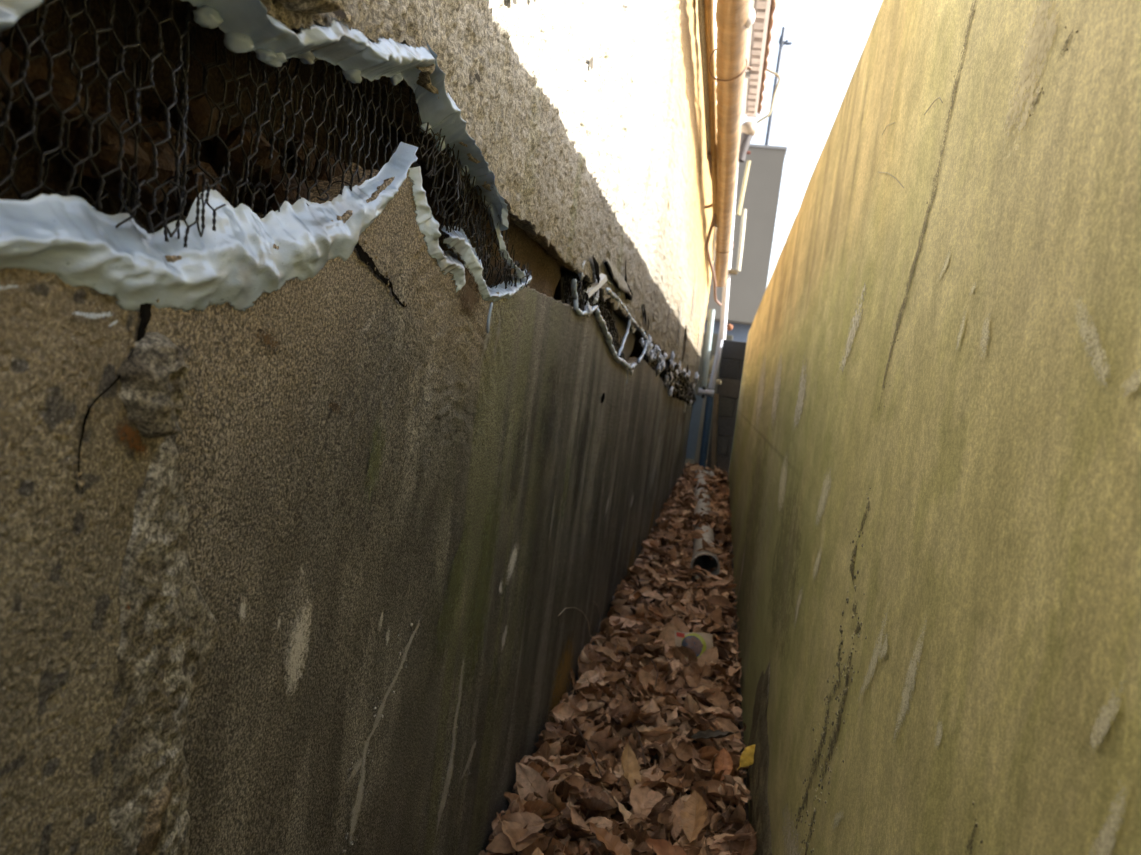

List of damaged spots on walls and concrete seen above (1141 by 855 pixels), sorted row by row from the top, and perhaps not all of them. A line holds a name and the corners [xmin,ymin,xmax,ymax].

spalling [0,0,532,333]
crack [354,240,407,307]
spalling [561,257,699,413]
crack [879,0,976,409]
crack [795,487,871,855]
crack [965,801,983,854]